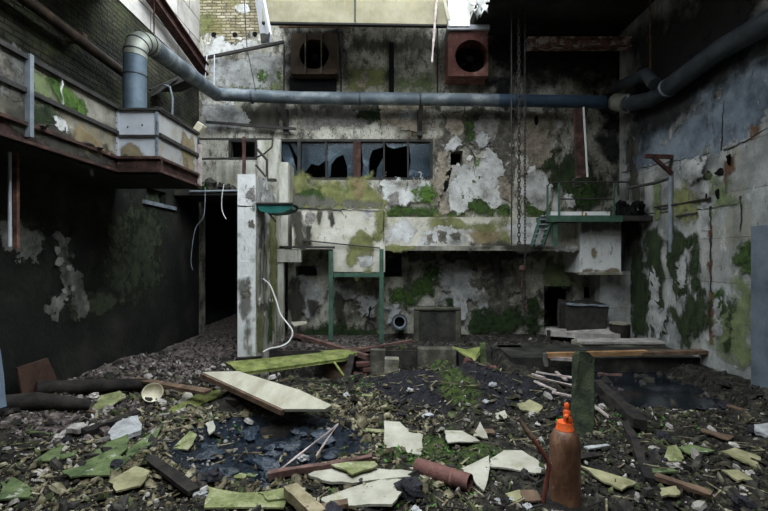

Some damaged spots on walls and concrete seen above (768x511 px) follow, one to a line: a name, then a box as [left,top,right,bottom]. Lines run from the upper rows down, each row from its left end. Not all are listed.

corrosion [73,125,106,156]
corrosion [120,143,143,156]
peeling [625,37,768,232]
flaking render [378,105,578,320]
peeling [0,219,90,324]
peeling [647,266,667,340]
peeling [675,254,689,298]
peeling [710,296,723,339]